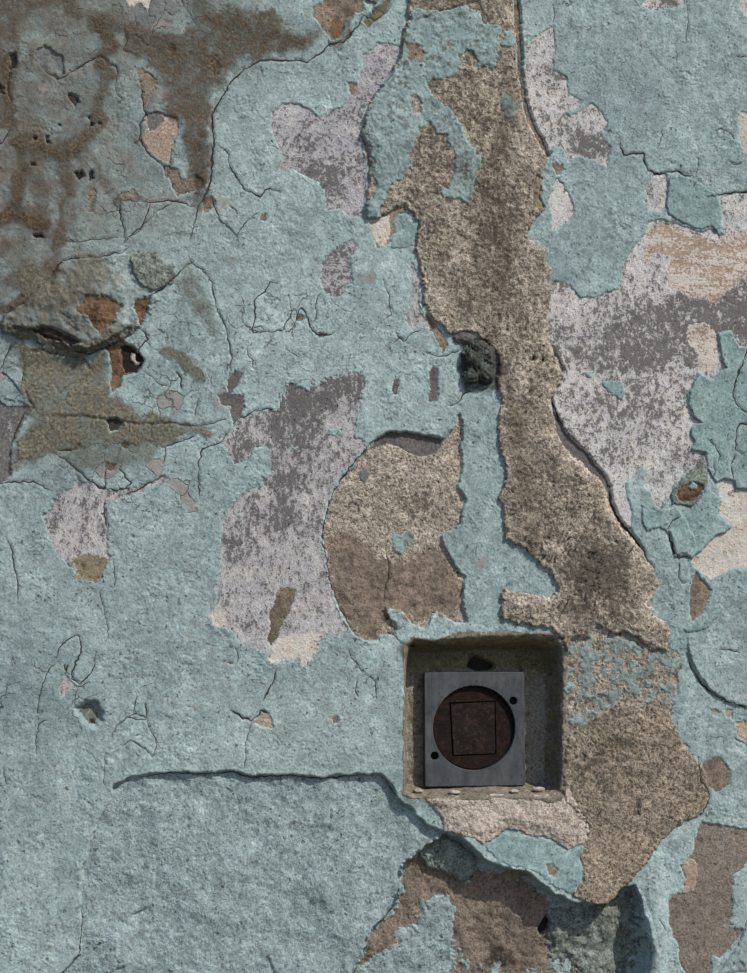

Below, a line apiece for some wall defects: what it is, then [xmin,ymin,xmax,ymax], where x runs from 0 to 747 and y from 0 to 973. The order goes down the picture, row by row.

water stain [0,0,318,246]
peeling [0,363,30,483]
peeling [42,472,172,584]
water stain [3,324,213,468]
spalling [107,343,144,392]
crack [0,4,393,526]
peeling [208,371,466,668]
spalling [271,0,747,651]
crack [35,555,116,754]
crack [69,906,84,967]
spalling [65,624,731,973]
peeling [668,822,747,973]